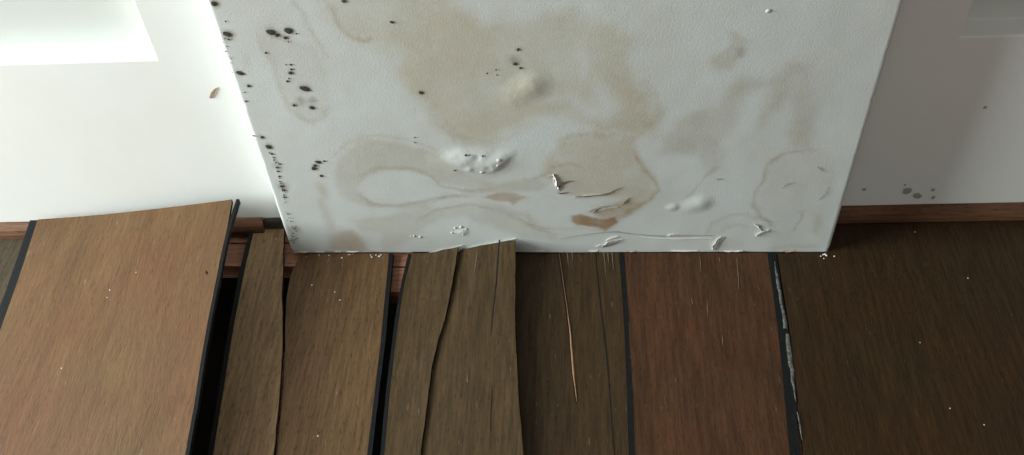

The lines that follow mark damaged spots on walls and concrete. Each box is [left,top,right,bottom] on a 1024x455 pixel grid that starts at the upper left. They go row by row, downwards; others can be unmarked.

water stain [252,135,298,243]
crack [490,240,500,336]
crack [557,181,713,452]